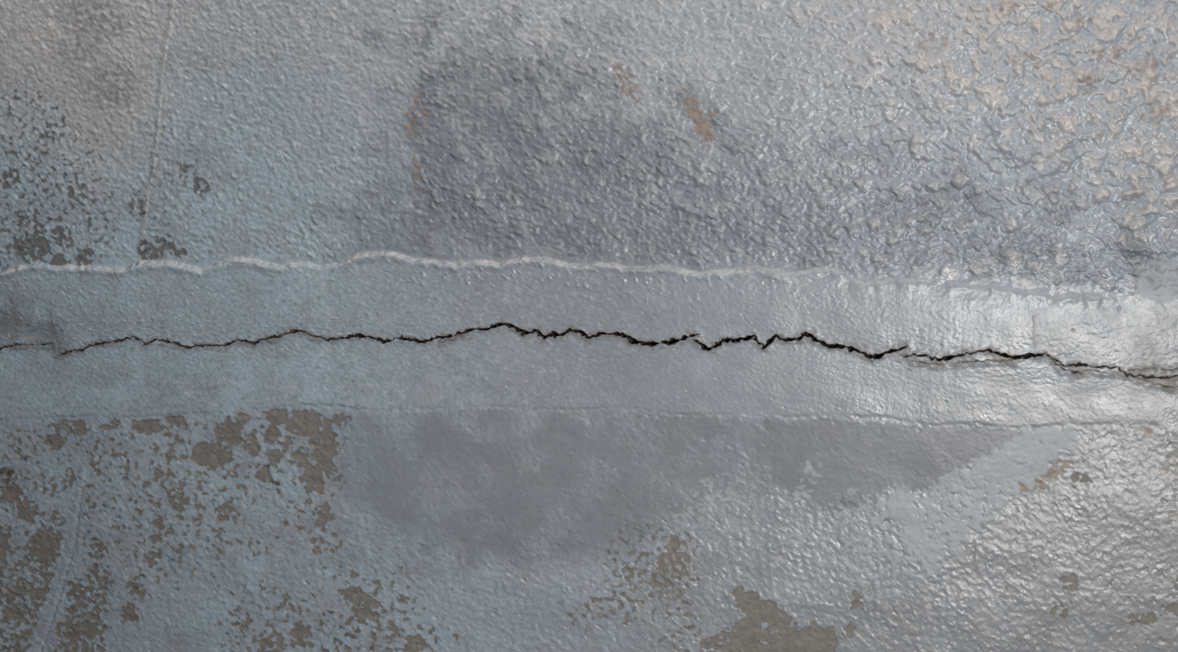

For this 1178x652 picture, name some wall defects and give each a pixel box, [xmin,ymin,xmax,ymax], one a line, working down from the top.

peeling [0,90,114,266]
peeling [137,234,187,260]
peeling [178,163,210,197]
crack [59,323,1178,388]
peeling [0,408,437,652]
peeling [569,473,855,652]